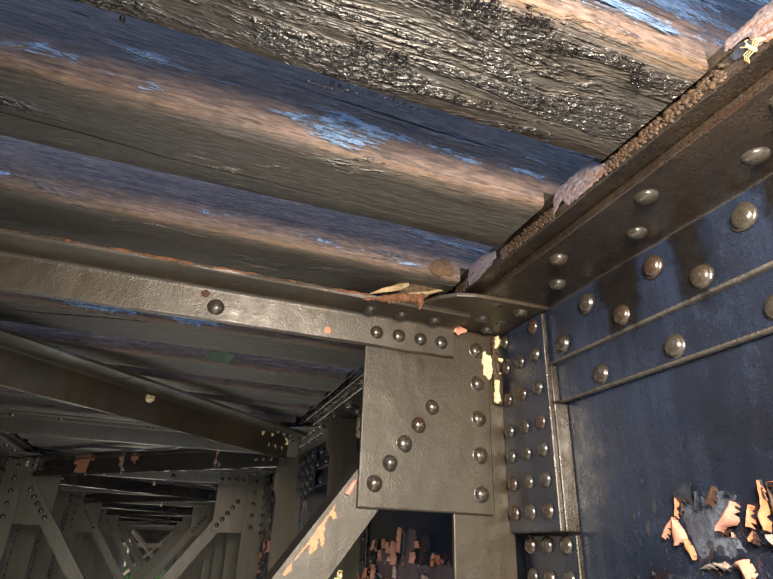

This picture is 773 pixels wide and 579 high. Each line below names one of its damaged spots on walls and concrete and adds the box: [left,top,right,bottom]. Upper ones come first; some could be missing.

corrosion [603,63,728,176]
corrosion [0,227,429,310]
peeling [74,458,94,475]
peeling [282,504,337,576]
peeling [357,527,453,579]
peeling [651,480,773,579]